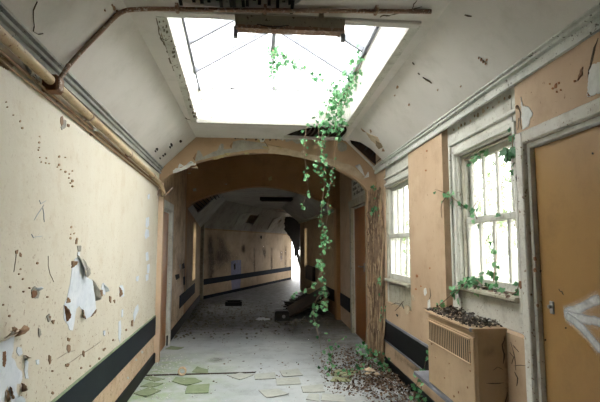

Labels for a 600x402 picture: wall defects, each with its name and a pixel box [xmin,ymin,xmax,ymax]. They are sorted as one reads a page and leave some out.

peeling [587,62,600,97]
peeling [515,99,533,130]
peeling [173,138,369,180]
peeling [361,128,385,152]
peeling [63,240,124,353]
peeling [0,325,39,402]